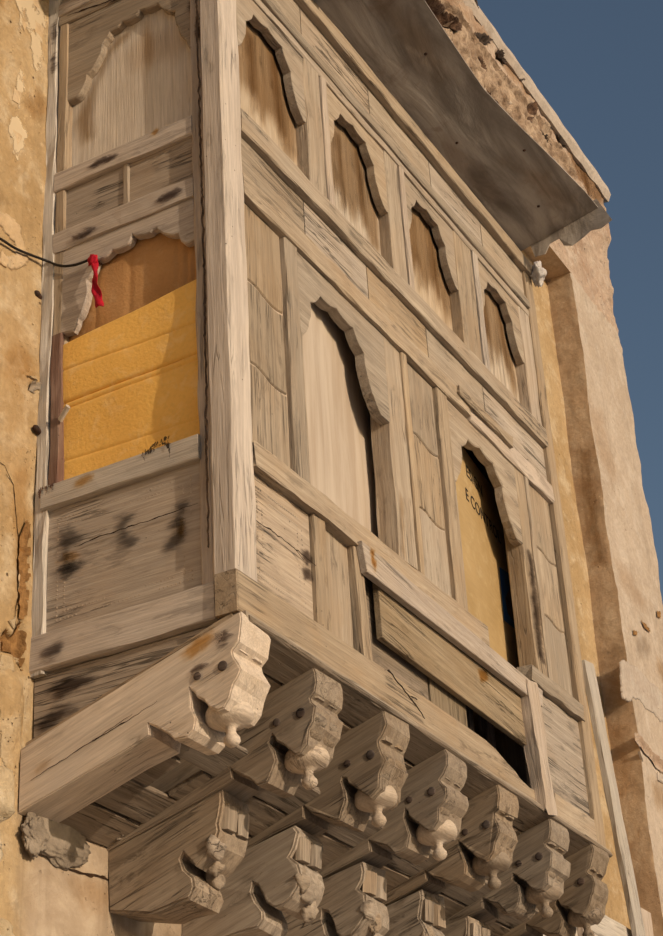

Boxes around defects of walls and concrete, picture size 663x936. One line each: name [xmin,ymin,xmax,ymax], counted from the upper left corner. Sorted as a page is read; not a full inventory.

peeling [15,0,57,71]
peeling [8,69,30,160]
crack [0,462,19,639]
spalling [0,520,31,672]
peeling [619,660,663,722]
spalling [634,733,663,783]